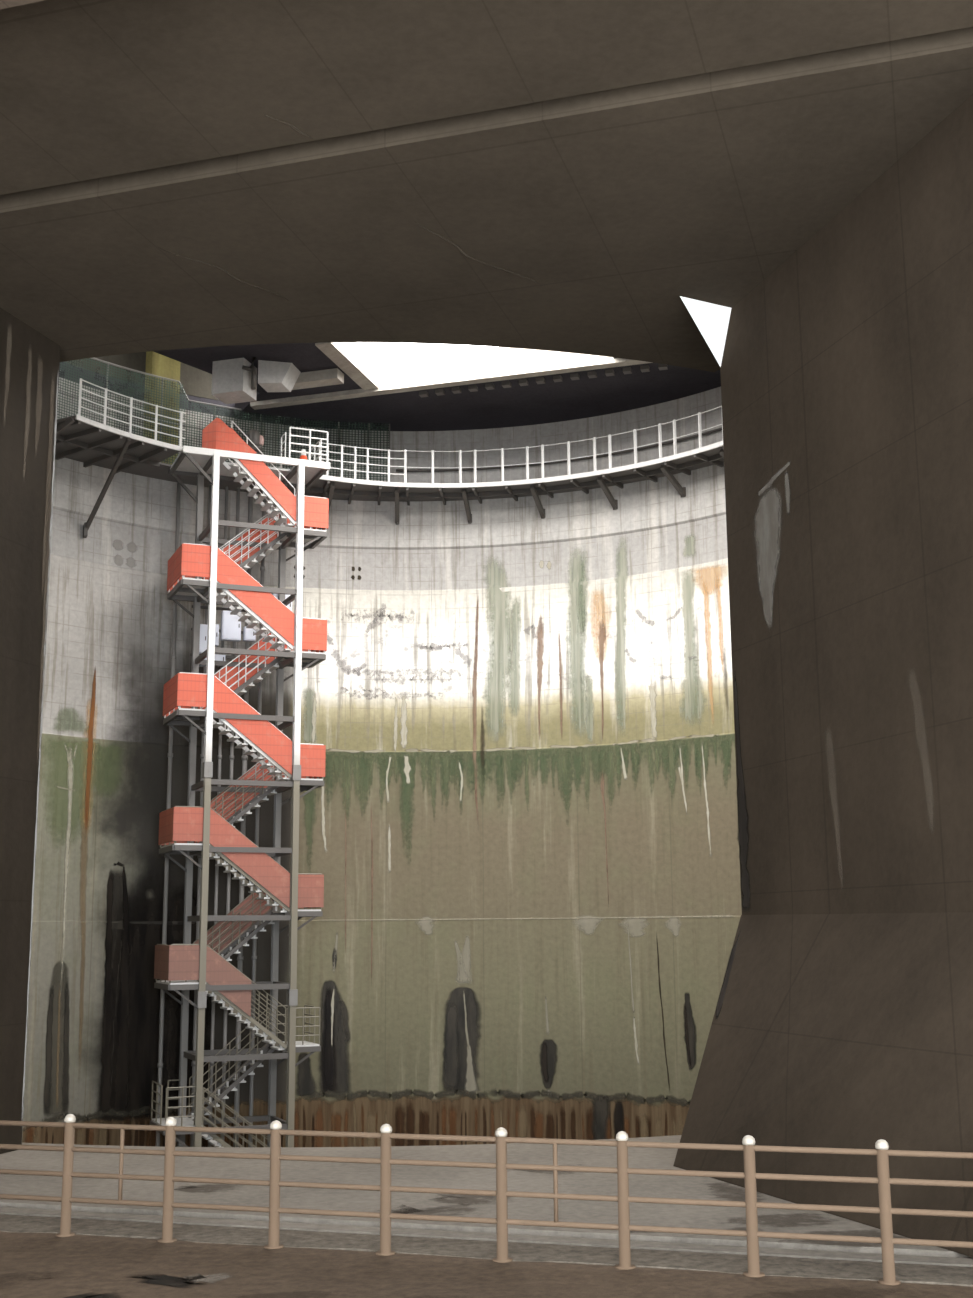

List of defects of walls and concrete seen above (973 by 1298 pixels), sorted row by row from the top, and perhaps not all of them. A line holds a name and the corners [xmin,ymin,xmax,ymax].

damp [312,694,463,801]
damp [613,686,718,854]
corrosion [79,668,96,1052]
damp [43,748,212,1122]
damp [381,917,552,934]
damp [297,920,691,1140]
damp [576,915,730,1070]